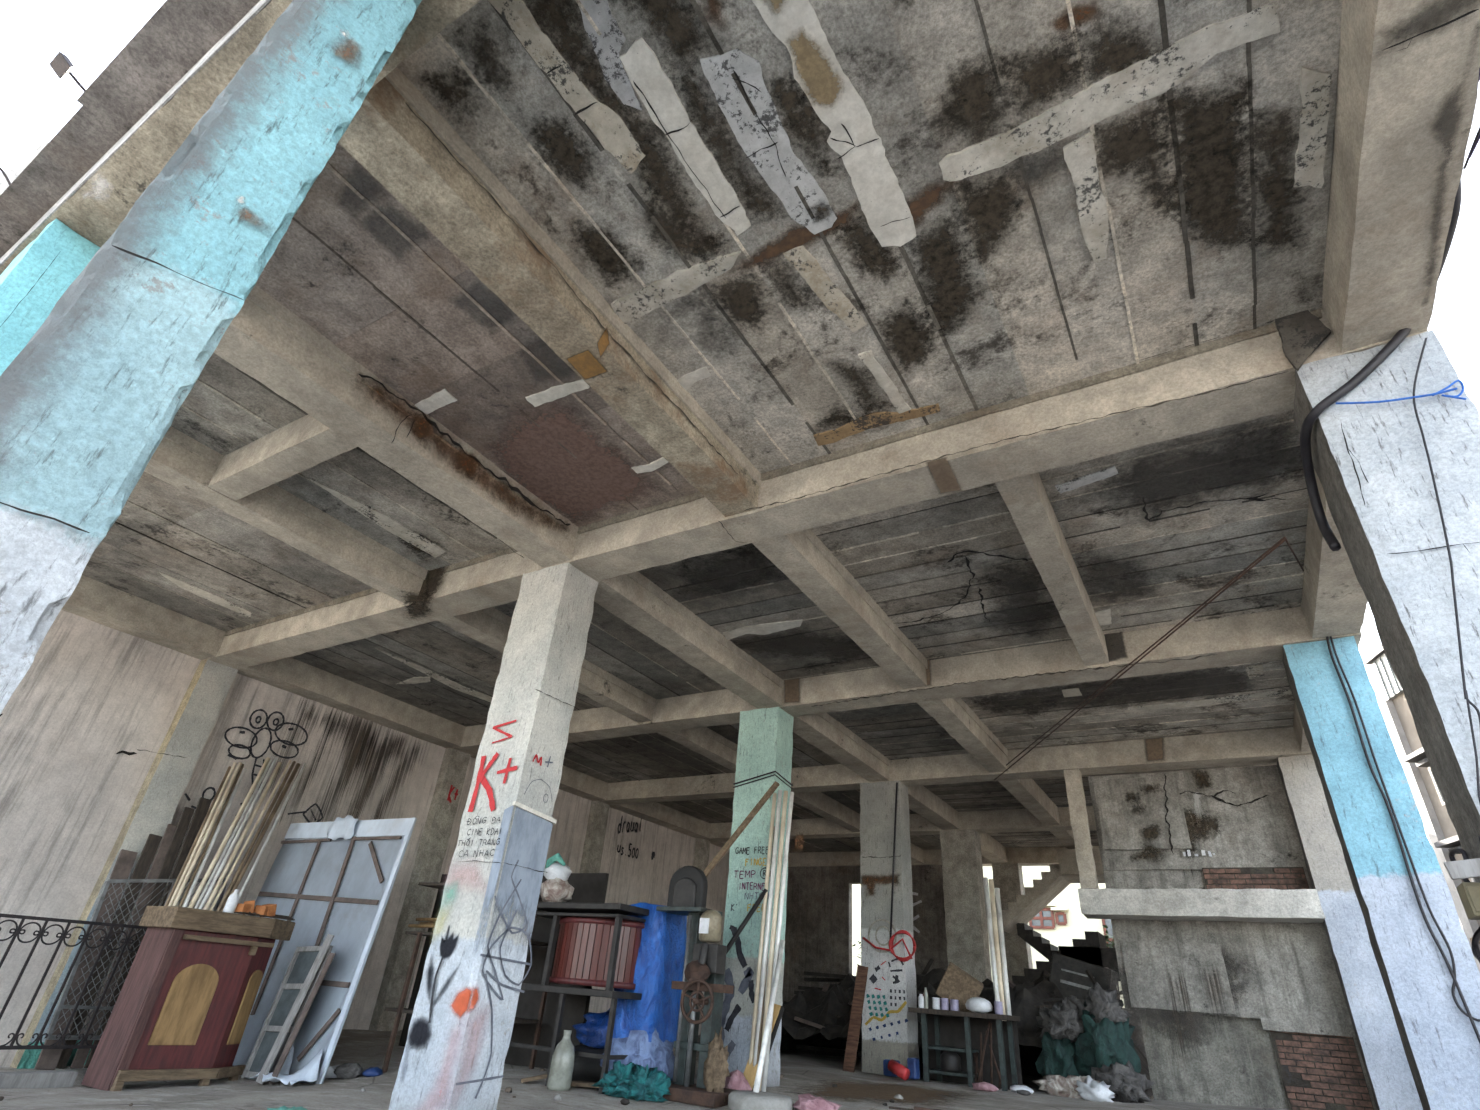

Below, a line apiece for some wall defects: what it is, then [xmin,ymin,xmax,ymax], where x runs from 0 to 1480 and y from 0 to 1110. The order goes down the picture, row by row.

damp [526,0,729,261]
damp [628,0,786,221]
damp [767,77,841,177]
damp [940,7,1162,144]
damp [1088,77,1307,253]
damp [571,220,640,288]
damp [679,261,811,354]
damp [835,157,1059,375]
rust [357,378,655,531]
crack [902,550,1052,625]
damp [266,705,419,821]
crack [1157,774,1267,855]